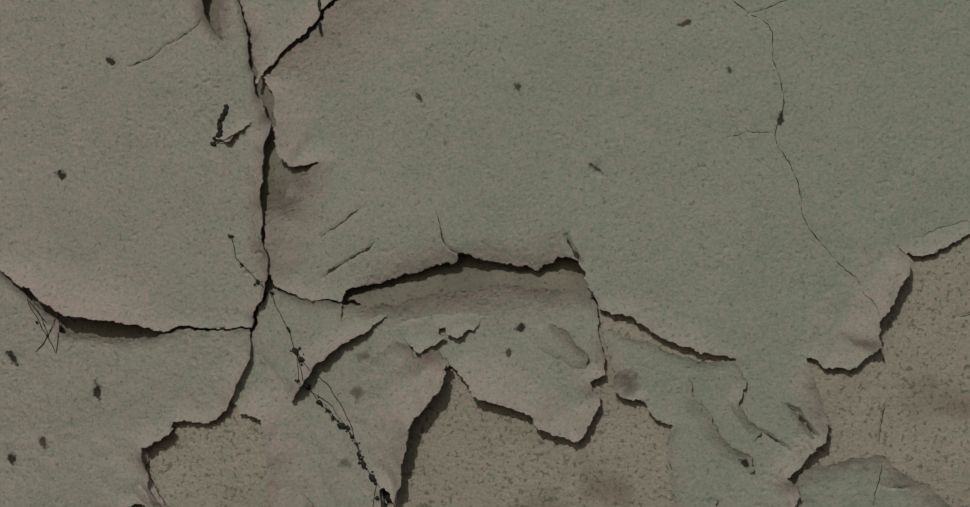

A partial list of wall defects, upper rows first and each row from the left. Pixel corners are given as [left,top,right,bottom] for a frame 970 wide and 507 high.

peeling [239,0,338,84]
crack [728,0,878,310]
crack [0,270,249,342]
peeling [132,391,271,507]
peeling [260,289,387,401]
peeling [315,313,677,507]
peeling [681,375,755,474]
peeling [765,220,970,507]